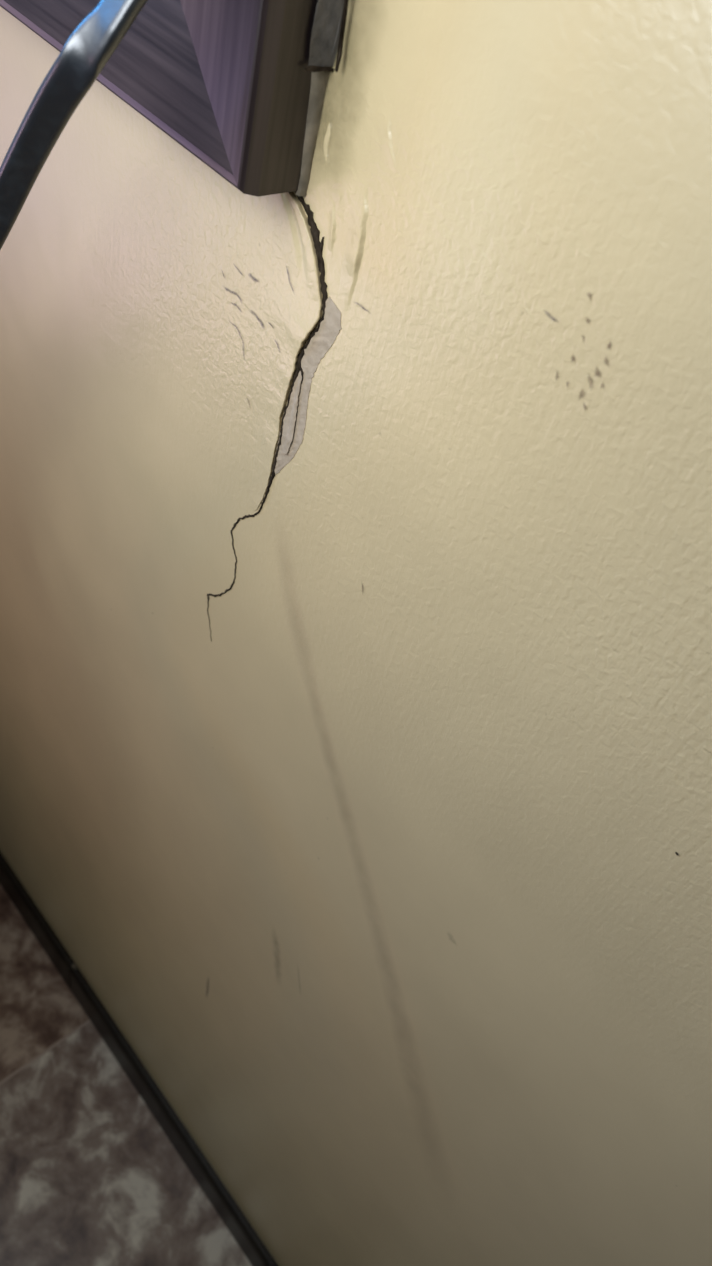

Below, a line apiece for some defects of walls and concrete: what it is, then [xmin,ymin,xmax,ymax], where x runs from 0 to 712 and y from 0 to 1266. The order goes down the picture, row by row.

crack [207,193,328,642]